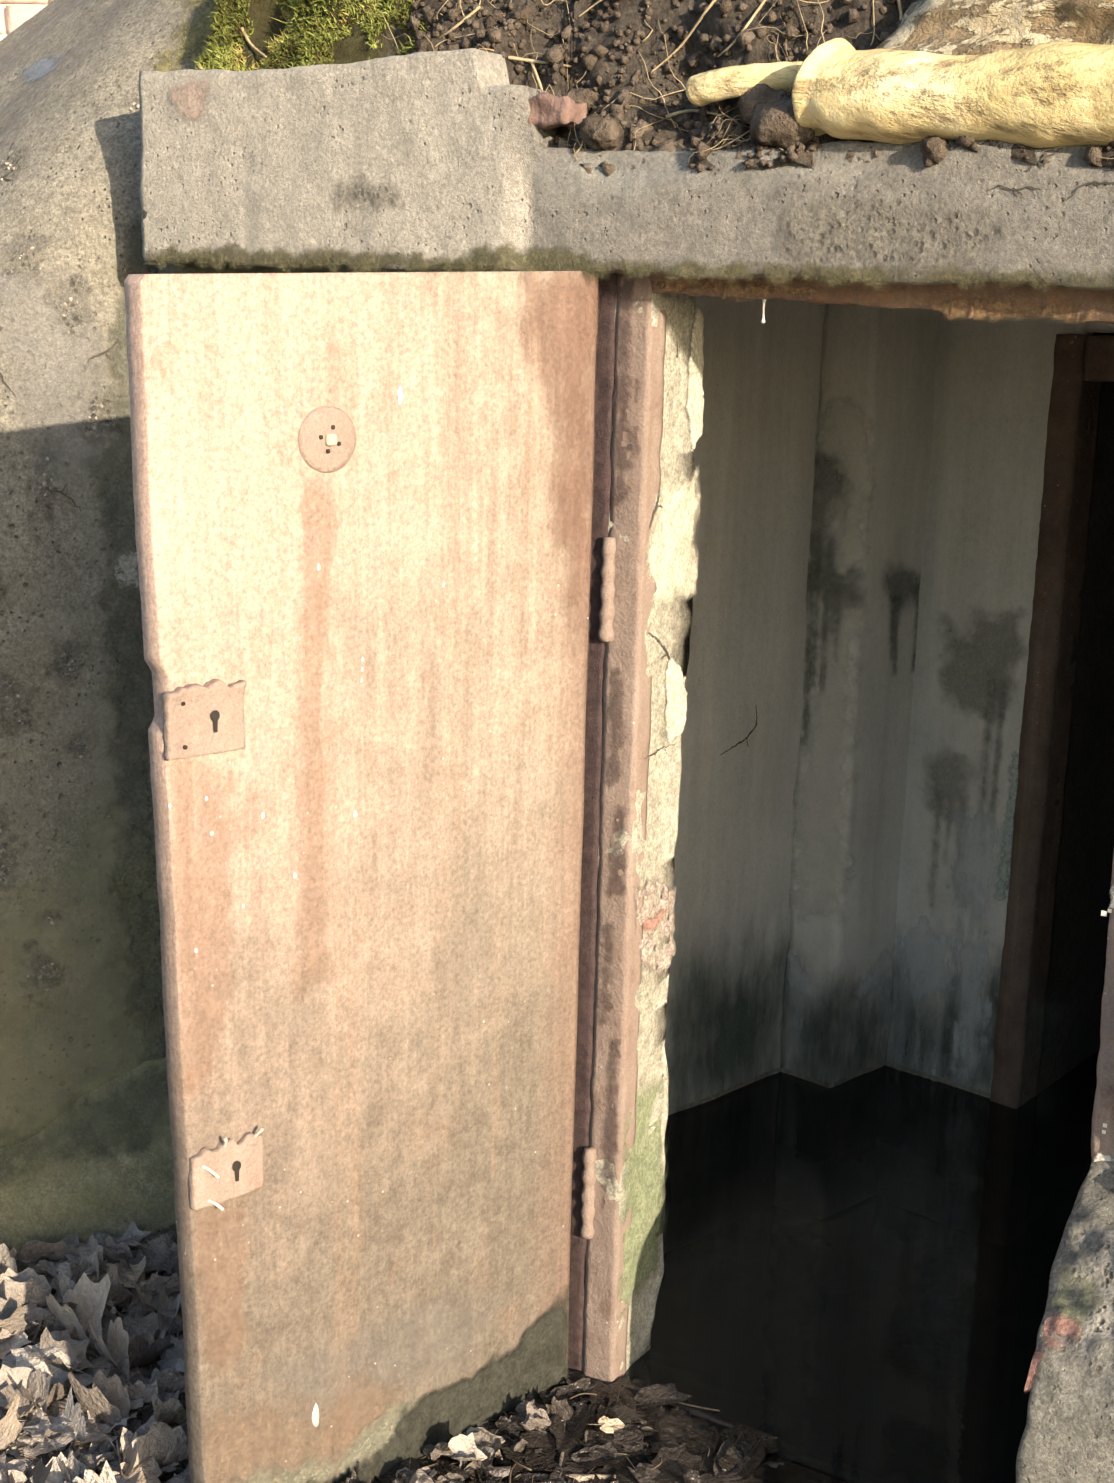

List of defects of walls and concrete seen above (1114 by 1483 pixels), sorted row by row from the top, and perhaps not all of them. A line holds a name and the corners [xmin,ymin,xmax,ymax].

damp [125,226,159,277]
rust [657,278,814,299]
rust [929,297,1095,322]
damp [804,456,861,730]
damp [886,570,920,672]
damp [0,274,168,1180]
damp [931,617,1018,914]
damp [672,919,999,1113]
rust [604,1043,618,1190]
damp [252,1298,569,1483]